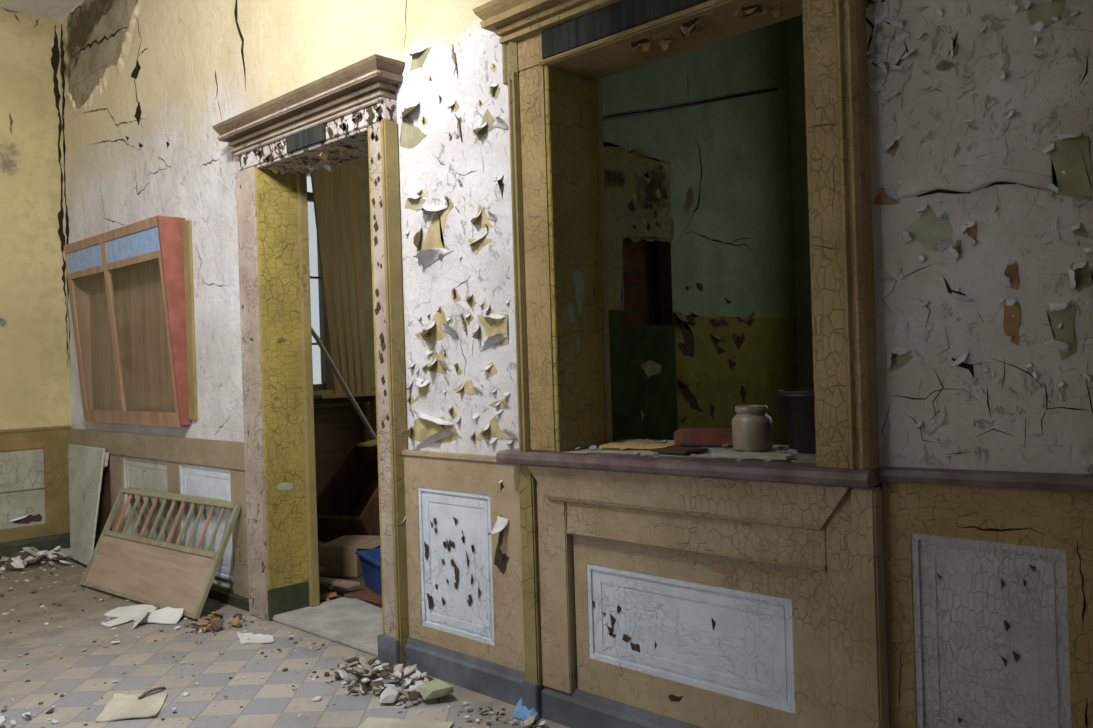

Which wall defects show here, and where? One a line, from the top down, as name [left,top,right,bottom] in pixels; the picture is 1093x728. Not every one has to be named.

spalling [61,0,144,118]
crack [234,0,246,91]
peeling [400,100,428,148]
peeling [409,46,432,81]
peeling [473,63,508,144]
crack [3,6,171,366]
peeling [237,104,383,245]
peeling [404,189,496,269]
peeling [400,287,518,450]
crack [882,264,1093,455]
peeling [427,517,481,610]
peeling [486,515,510,574]